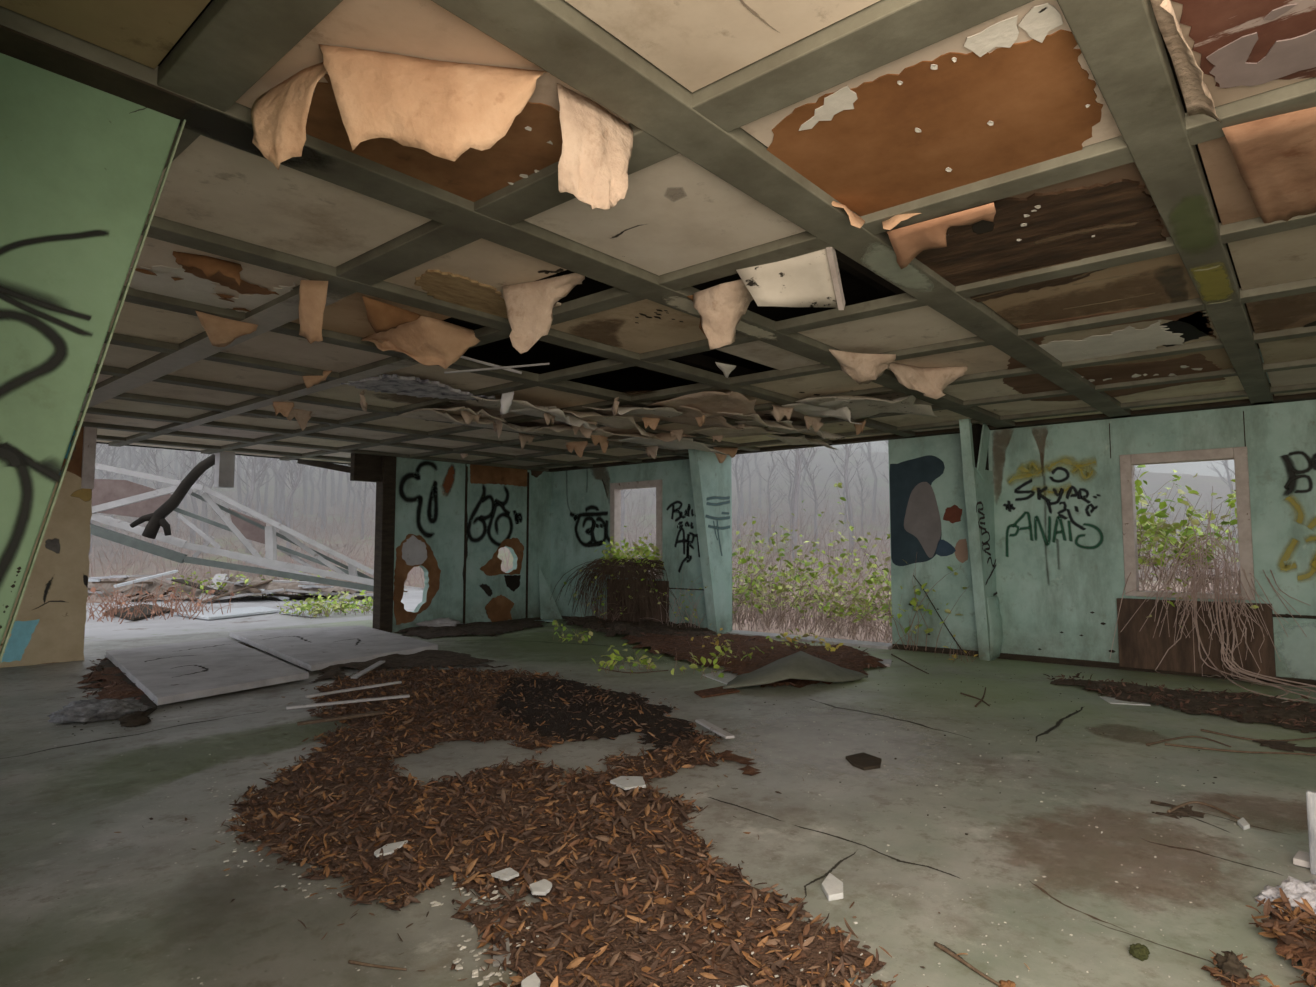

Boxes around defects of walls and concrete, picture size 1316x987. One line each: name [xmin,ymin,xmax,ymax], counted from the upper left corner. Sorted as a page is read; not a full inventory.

peeling [1150,0,1316,123]
peeling [306,74,562,202]
peeling [767,3,1103,289]
peeling [736,321,777,339]
peeling [168,360,419,430]
hole [393,534,441,625]
spalling [479,538,524,597]
crack [709,797,959,897]